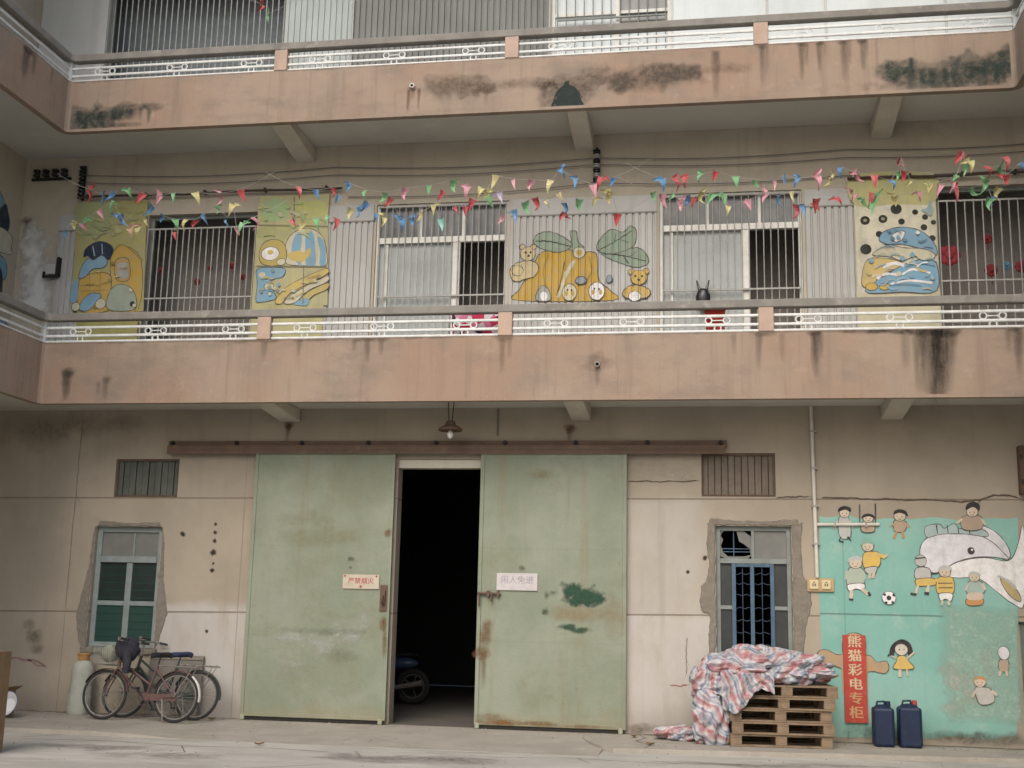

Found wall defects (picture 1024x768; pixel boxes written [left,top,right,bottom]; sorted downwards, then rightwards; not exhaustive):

leakage [593,64,701,91]
leakage [879,46,1011,87]
leakage [72,105,147,129]
leakage [868,329,949,393]
crack [776,494,1021,503]
peeling [563,583,604,607]
peeling [563,624,587,632]